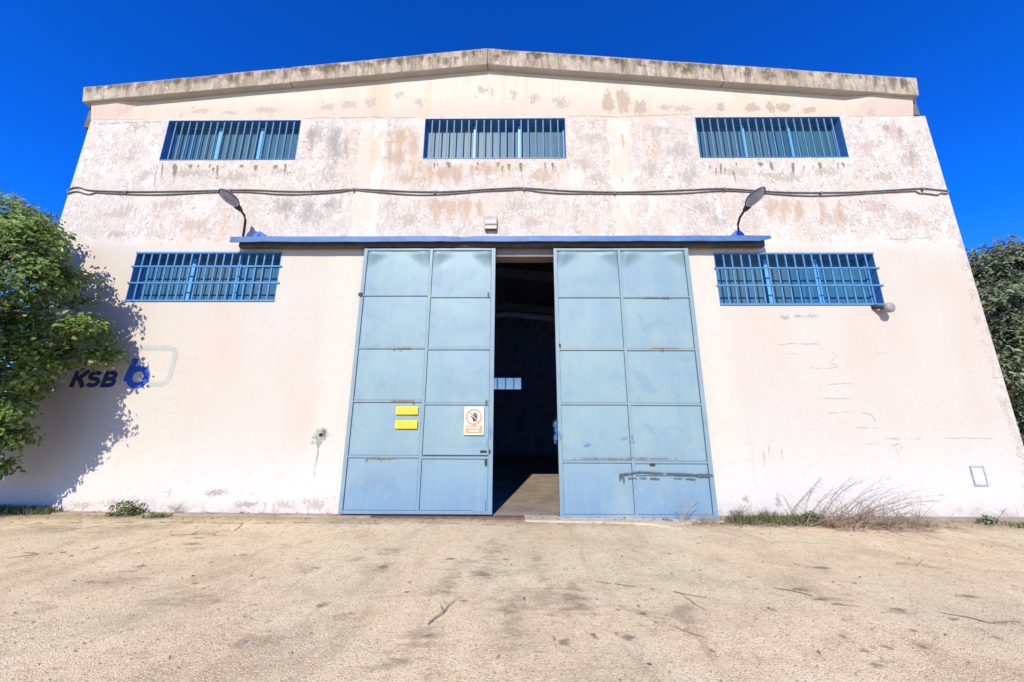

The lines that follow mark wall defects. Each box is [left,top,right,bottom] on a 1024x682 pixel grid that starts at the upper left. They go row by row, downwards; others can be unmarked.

water stain [85,72,250,91]
peeling [602,84,695,142]
water stain [430,162,522,179]